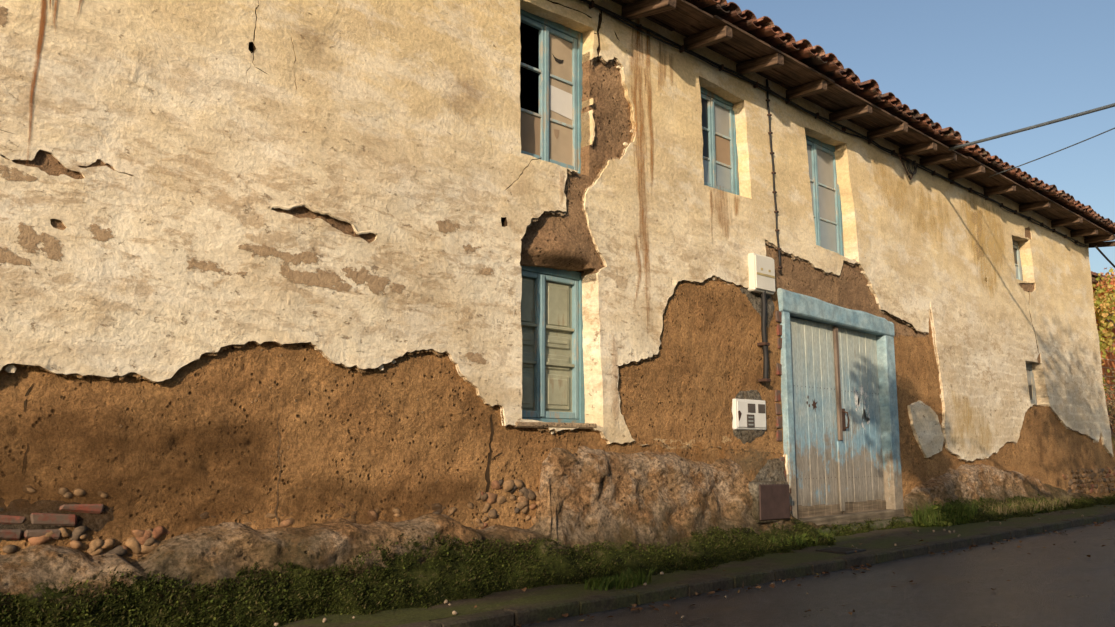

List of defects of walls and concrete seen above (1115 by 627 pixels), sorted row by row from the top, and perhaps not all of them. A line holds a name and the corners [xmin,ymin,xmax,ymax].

rust [29,0,58,139]
crack [246,1,297,89]
peeling [0,150,132,182]
spalling [520,53,634,282]
peeling [0,219,66,267]
peeling [89,224,114,242]
peeling [268,203,376,243]
peeling [435,218,460,236]
spalling [0,240,1115,562]
crack [485,414,502,493]